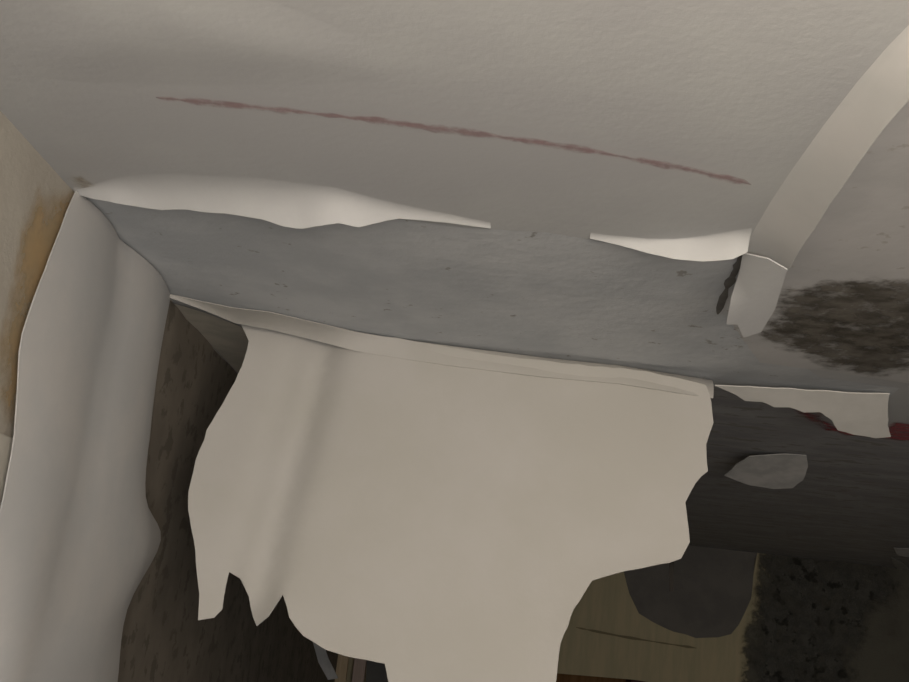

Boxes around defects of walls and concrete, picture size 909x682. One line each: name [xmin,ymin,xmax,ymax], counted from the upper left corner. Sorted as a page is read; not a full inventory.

peeling [72,25,909,397]
water stain [762,281,909,373]
peeling [118,298,335,682]
peeling [326,650,338,672]
peeling [624,387,909,638]
water stain [742,553,909,682]